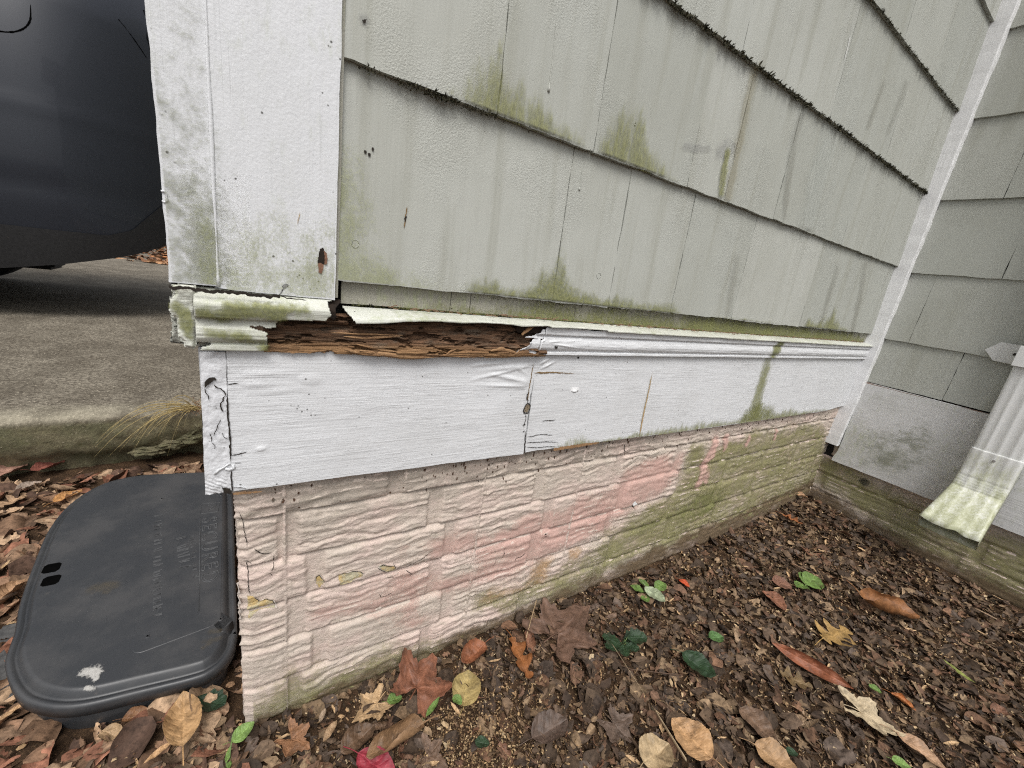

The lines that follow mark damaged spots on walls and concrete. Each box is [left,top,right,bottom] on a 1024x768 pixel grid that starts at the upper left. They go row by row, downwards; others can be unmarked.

leakage [720,150,730,196]
spalling [516,326,548,353]
crack [523,365,574,451]
crack [205,364,274,593]
leakage [695,435,729,487]